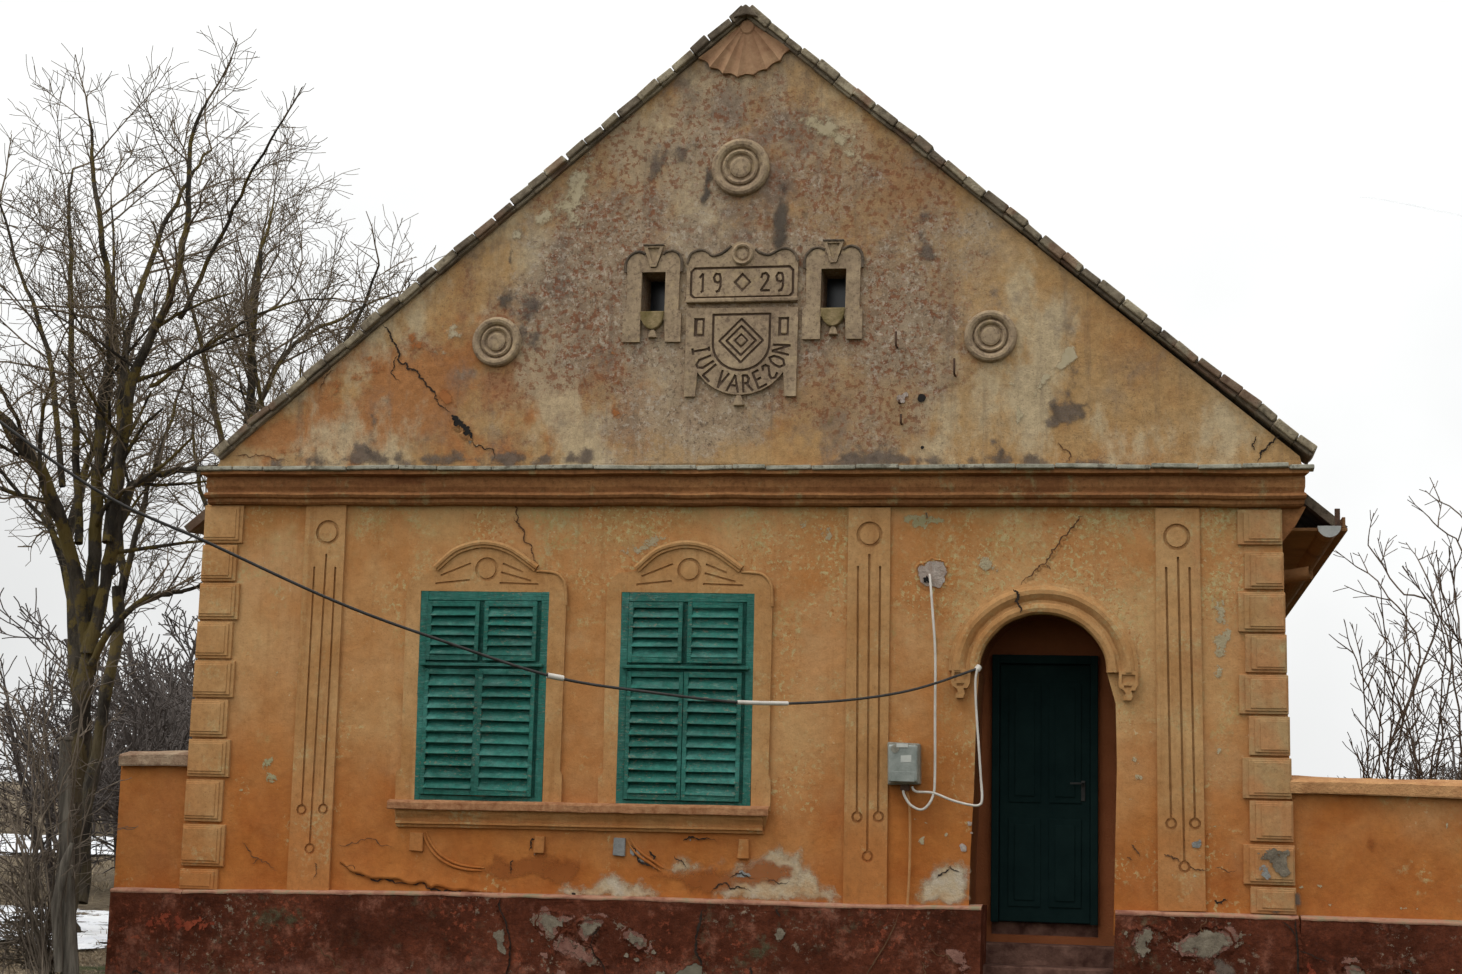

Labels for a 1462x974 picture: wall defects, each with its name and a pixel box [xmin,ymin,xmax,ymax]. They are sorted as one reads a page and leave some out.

crack [383,325,495,458]
crack [1013,515,1085,613]
spalling [493,929,506,954]
crack [495,838,535,974]
crack [590,924,609,974]
spalling [528,874,707,974]
peeling [630,836,715,873]
crack [694,907,707,974]
peeling [713,849,836,902]
peeling [916,821,973,904]
spalling [1124,921,1251,974]
spalling [1258,848,1322,888]